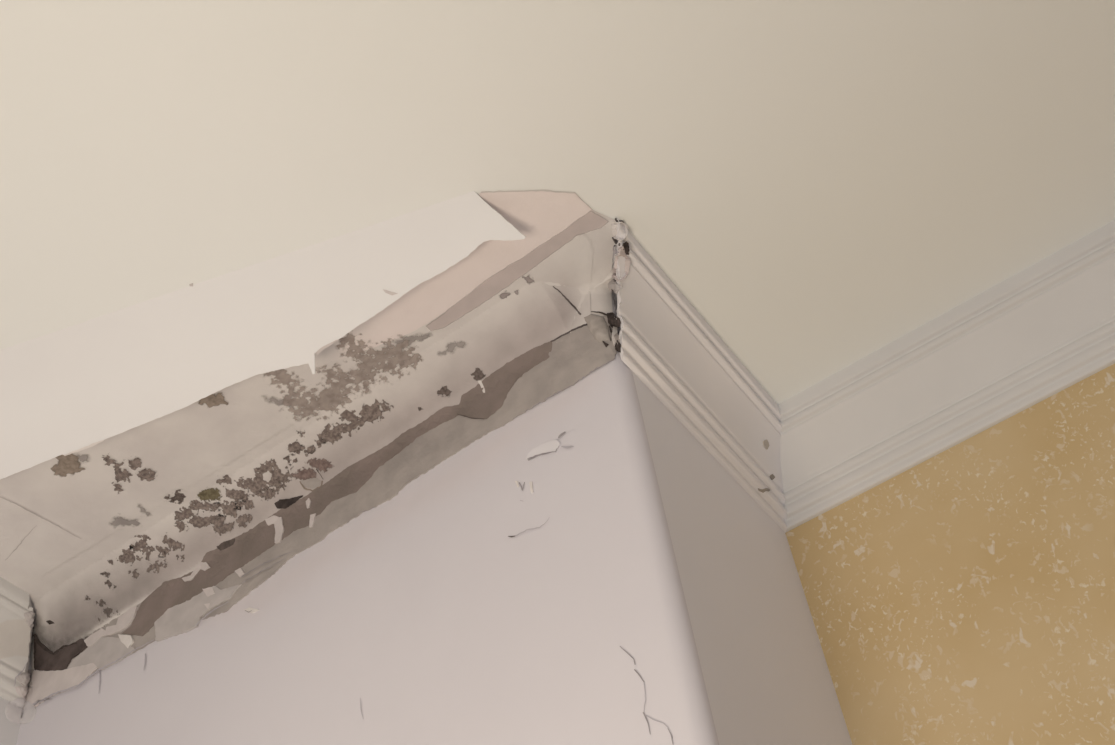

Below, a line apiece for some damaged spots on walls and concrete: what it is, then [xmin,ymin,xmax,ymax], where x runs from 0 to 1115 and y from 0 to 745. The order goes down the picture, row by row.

damp [264,333,430,420]
damp [438,342,465,354]
peeling [0,190,631,707]
damp [111,505,150,526]
damp [170,359,619,648]
crack [620,646,673,743]